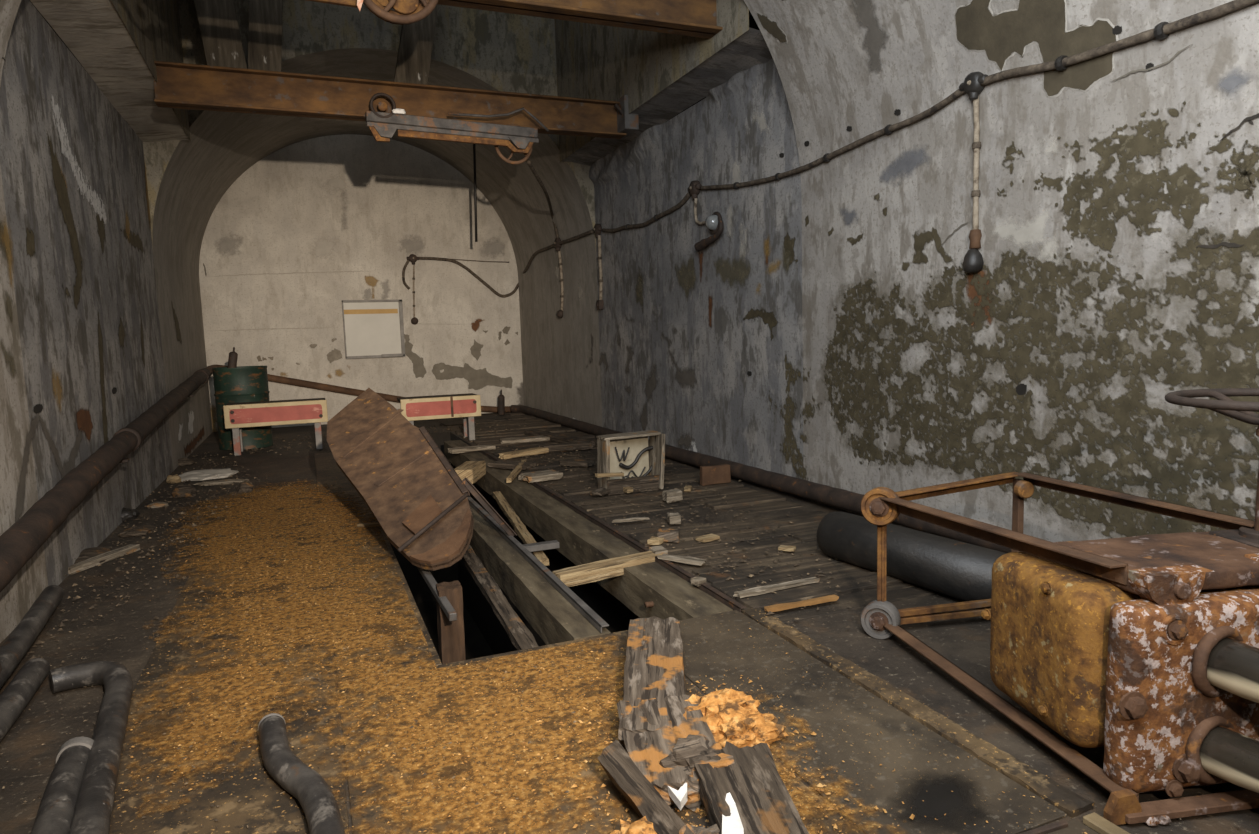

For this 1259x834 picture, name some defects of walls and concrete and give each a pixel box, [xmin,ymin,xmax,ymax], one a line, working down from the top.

flaking render [954,0,1119,98]
leakage [1,340,16,377]
flaking render [404,326,518,390]